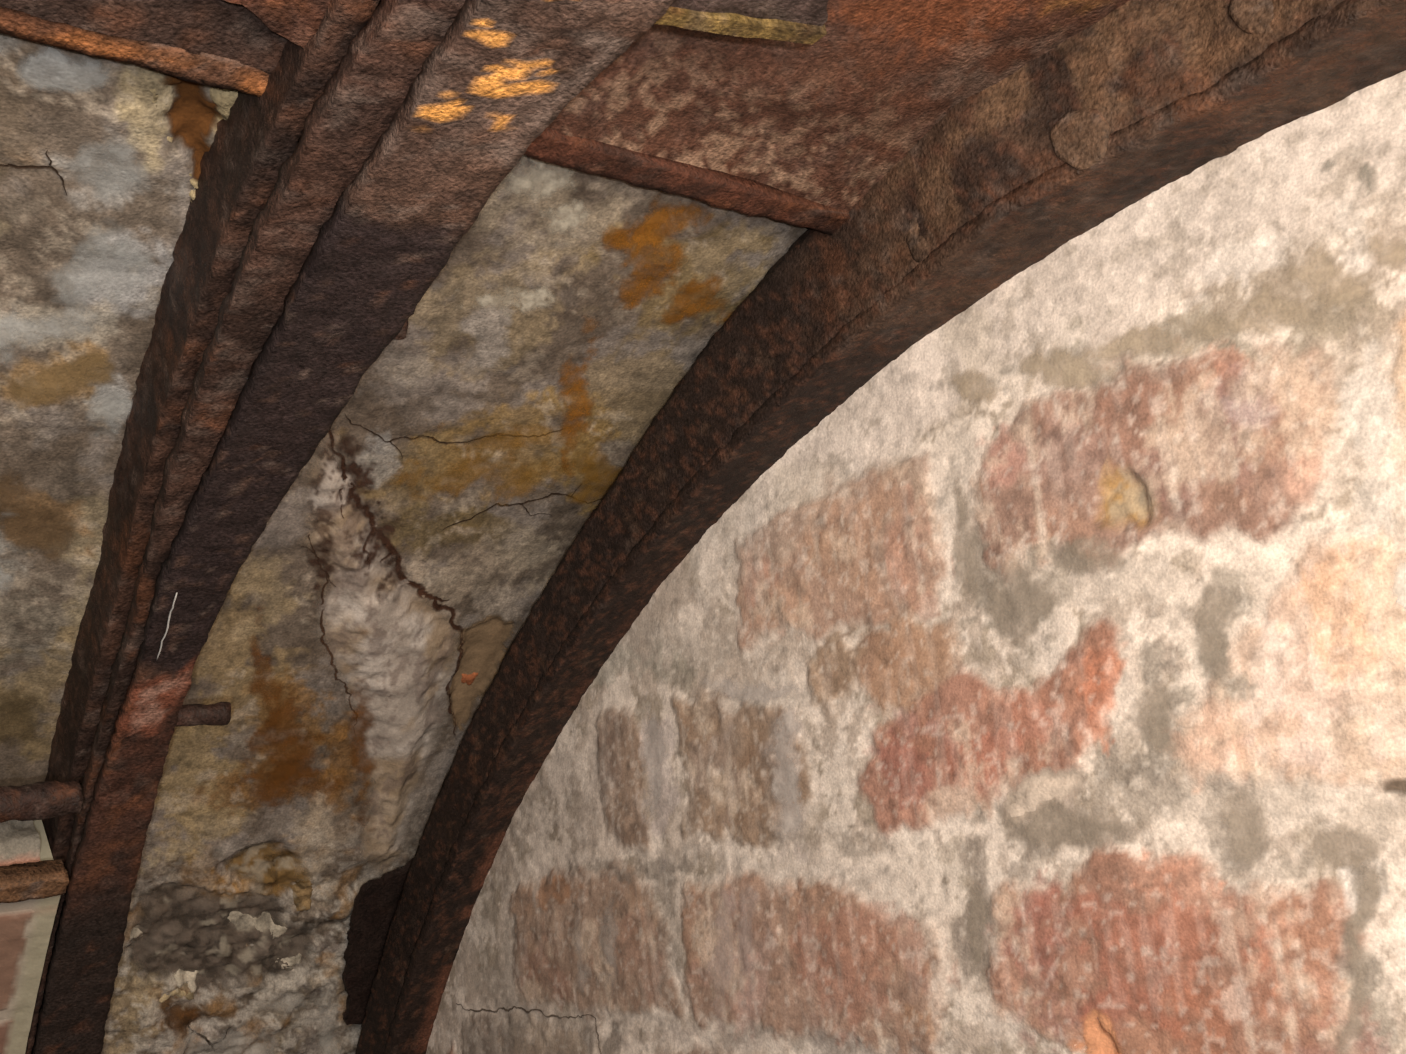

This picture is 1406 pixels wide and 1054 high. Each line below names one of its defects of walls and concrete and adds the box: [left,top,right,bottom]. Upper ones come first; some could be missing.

crack [0,150,67,195]
rust [604,202,700,307]
crack [444,489,602,529]
crack [328,415,568,736]
crack [303,534,357,733]